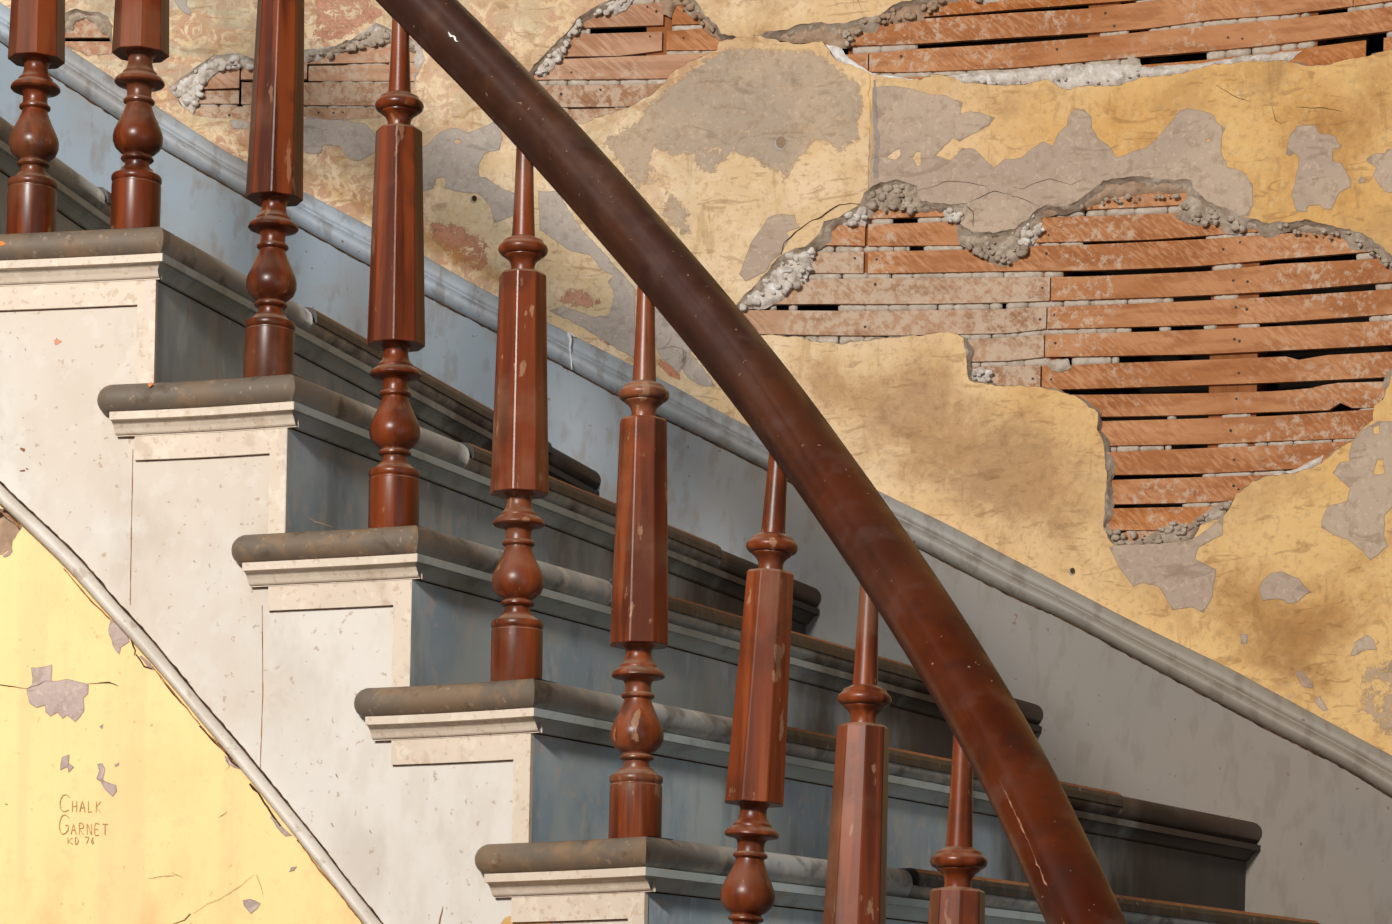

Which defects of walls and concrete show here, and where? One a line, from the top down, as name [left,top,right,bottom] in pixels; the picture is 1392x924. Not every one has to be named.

flaking render [169,53,254,129]
flaking render [303,0,392,161]
flaking render [409,37,425,89]
flaking render [530,0,1392,613]
flaking render [0,509,22,557]
peeling [27,665,89,722]
peeling [1351,635,1392,735]